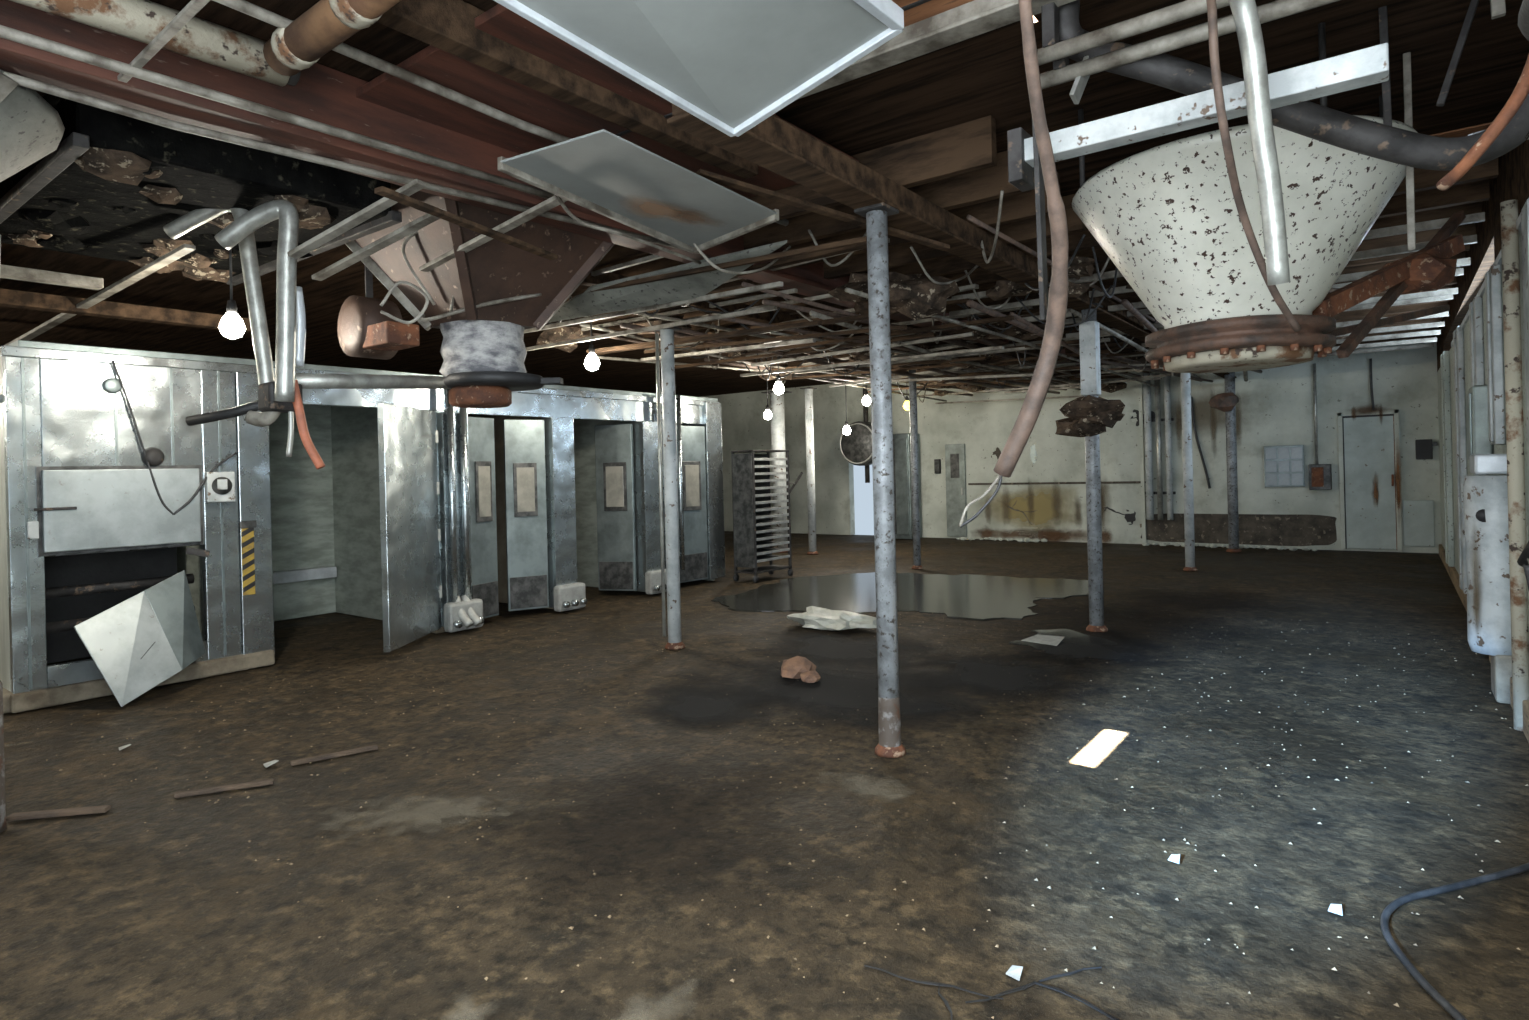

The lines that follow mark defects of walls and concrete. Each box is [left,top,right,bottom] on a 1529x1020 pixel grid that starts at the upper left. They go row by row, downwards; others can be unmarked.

damp [986,490,1080,527]